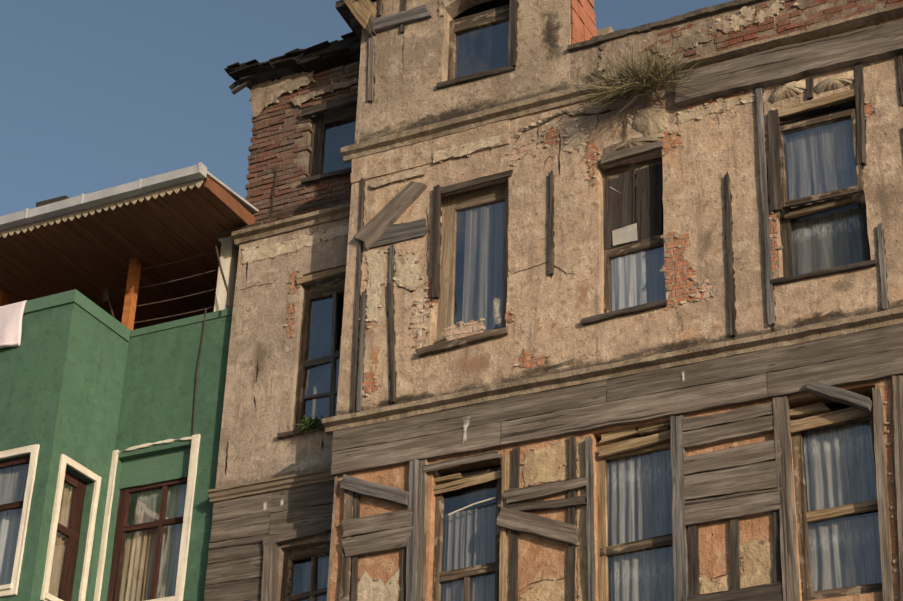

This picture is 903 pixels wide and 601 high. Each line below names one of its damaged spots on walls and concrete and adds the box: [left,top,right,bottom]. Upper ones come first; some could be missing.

water stain [542,14,561,57]
flaking render [597,0,903,77]
crack [514,105,618,174]
flaking render [284,270,301,338]
flaking render [362,371,382,397]
peeling [358,250,437,349]
flaking render [441,317,486,341]
flaking render [515,348,551,369]
crack [504,193,575,282]
flaking render [660,231,716,310]
flaking render [885,385,901,601]
peeling [357,569,401,601]